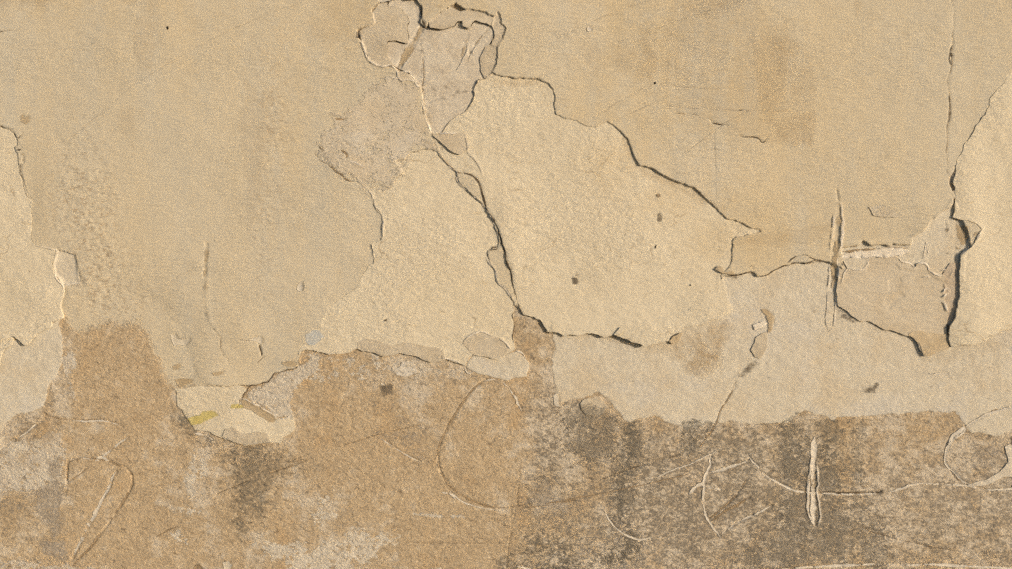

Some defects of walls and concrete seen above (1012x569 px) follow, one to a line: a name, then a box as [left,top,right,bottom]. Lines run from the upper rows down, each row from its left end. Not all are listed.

peeling [0,126,81,501]
spalling [173,448,211,517]
spalling [250,495,401,569]